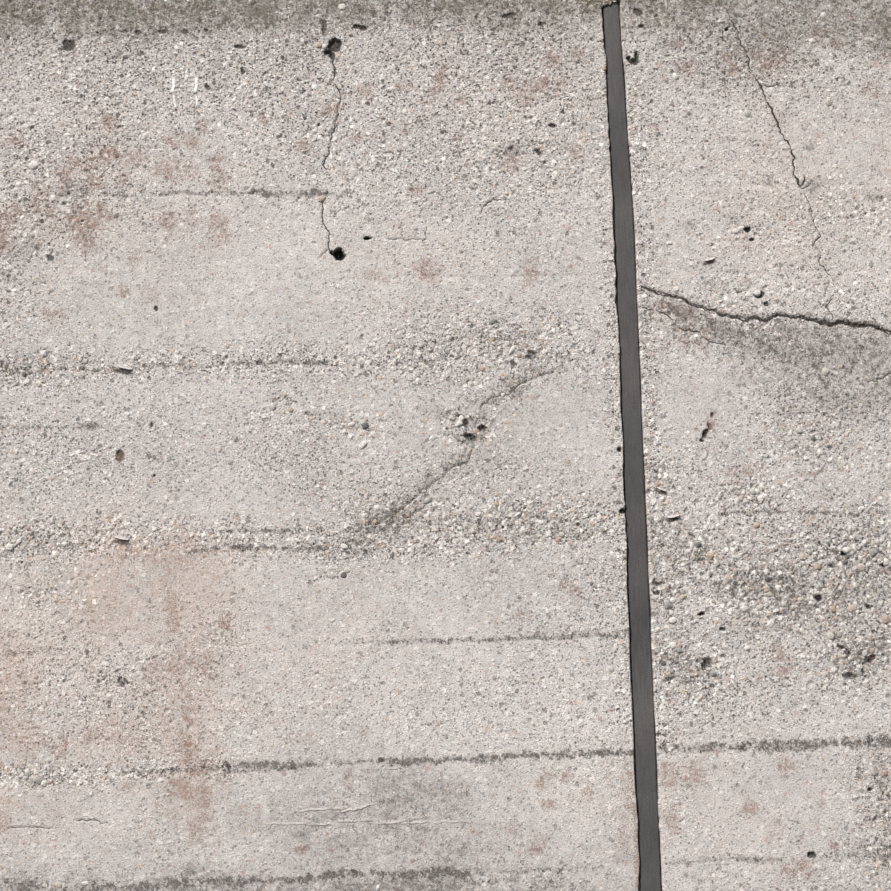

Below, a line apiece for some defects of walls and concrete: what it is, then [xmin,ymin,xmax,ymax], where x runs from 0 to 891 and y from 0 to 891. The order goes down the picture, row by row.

crack [323,59,341,169]
crack [321,202,334,256]
crack [641,9,891,345]